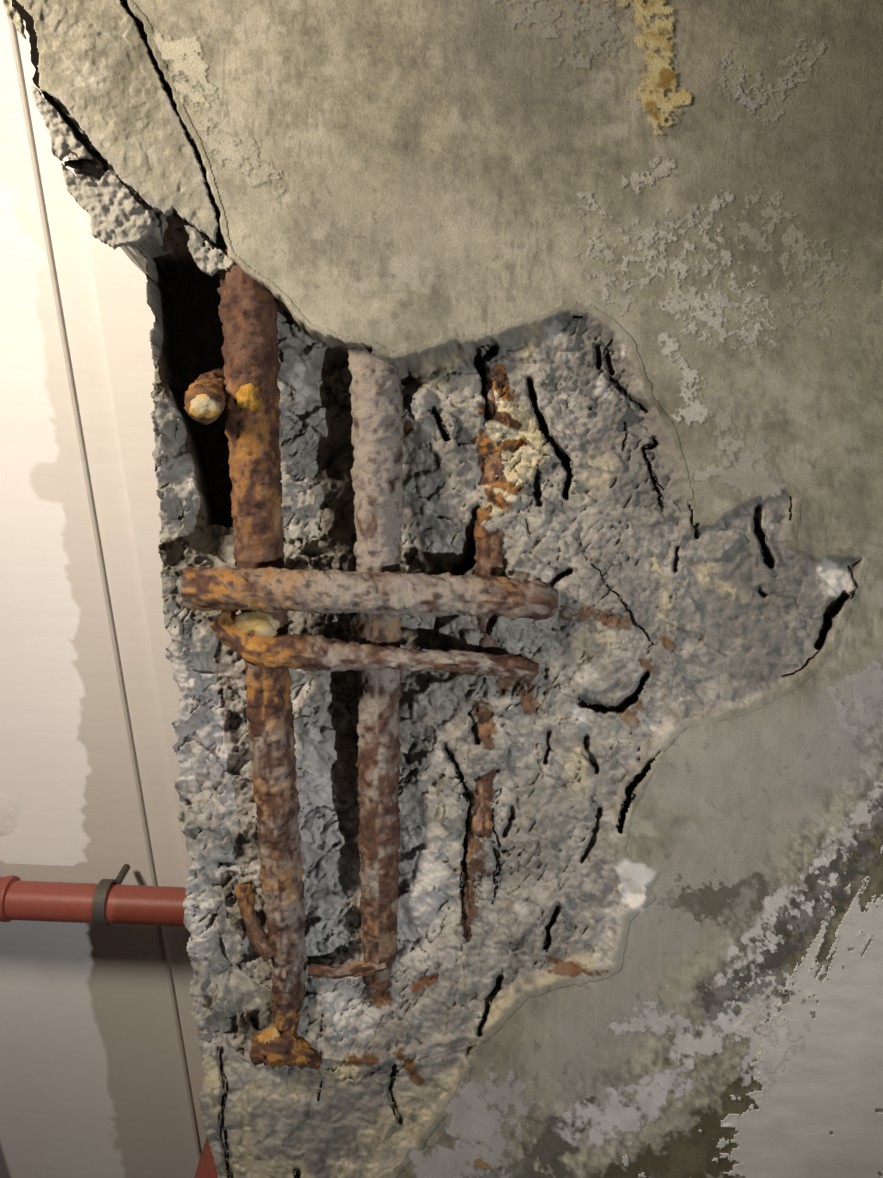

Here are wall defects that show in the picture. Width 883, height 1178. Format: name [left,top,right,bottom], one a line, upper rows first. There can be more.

crack [12,0,150,211]
crack [120,0,223,256]
corrosion [571,0,692,134]
corrosion [476,365,543,516]
spalling [16,0,694,1178]
crack [578,672,648,712]
spalling [670,479,872,729]
crack [781,565,858,678]
damp [828,654,883,736]
corrosion [395,1048,425,1085]
damp [390,771,883,1178]
peeling [712,876,883,1178]